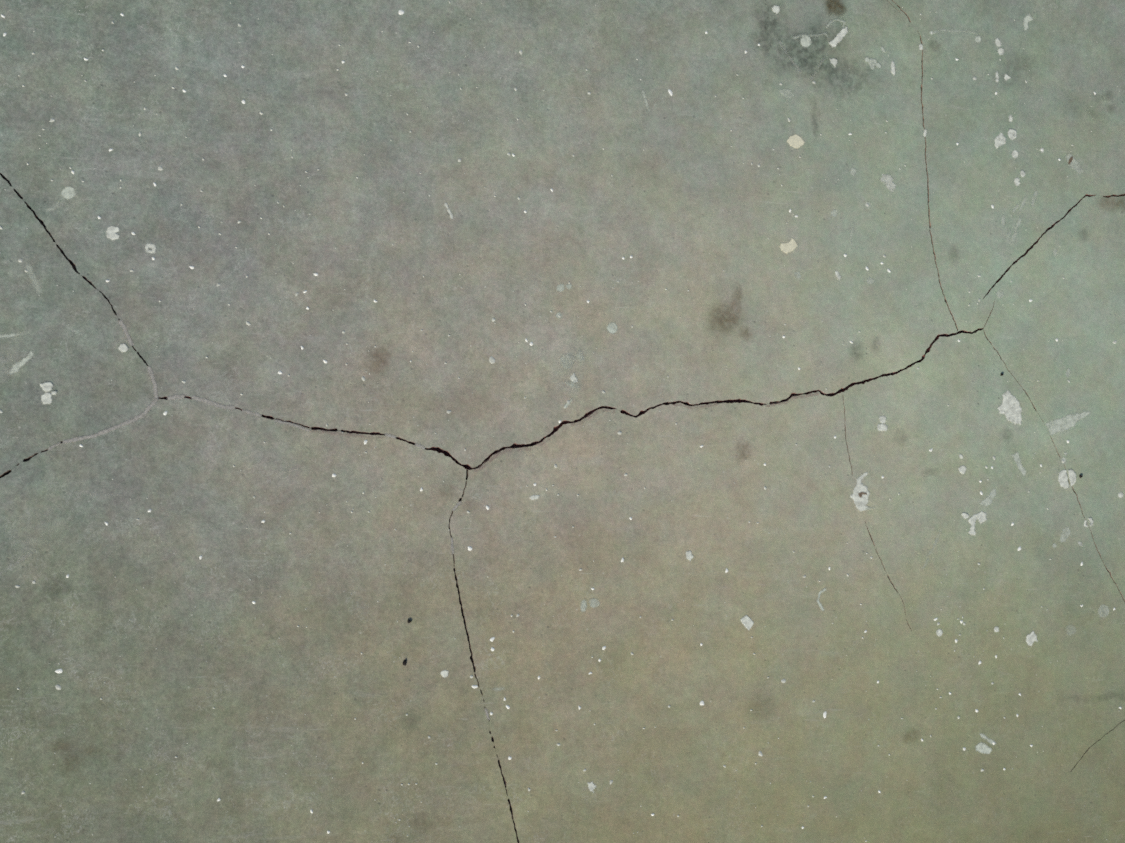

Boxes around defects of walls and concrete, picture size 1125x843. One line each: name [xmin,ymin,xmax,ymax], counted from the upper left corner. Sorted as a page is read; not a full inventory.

crack [888,0,925,130]
crack [983,194,1125,299]
crack [0,137,1045,843]
crack [1050,436,1125,602]